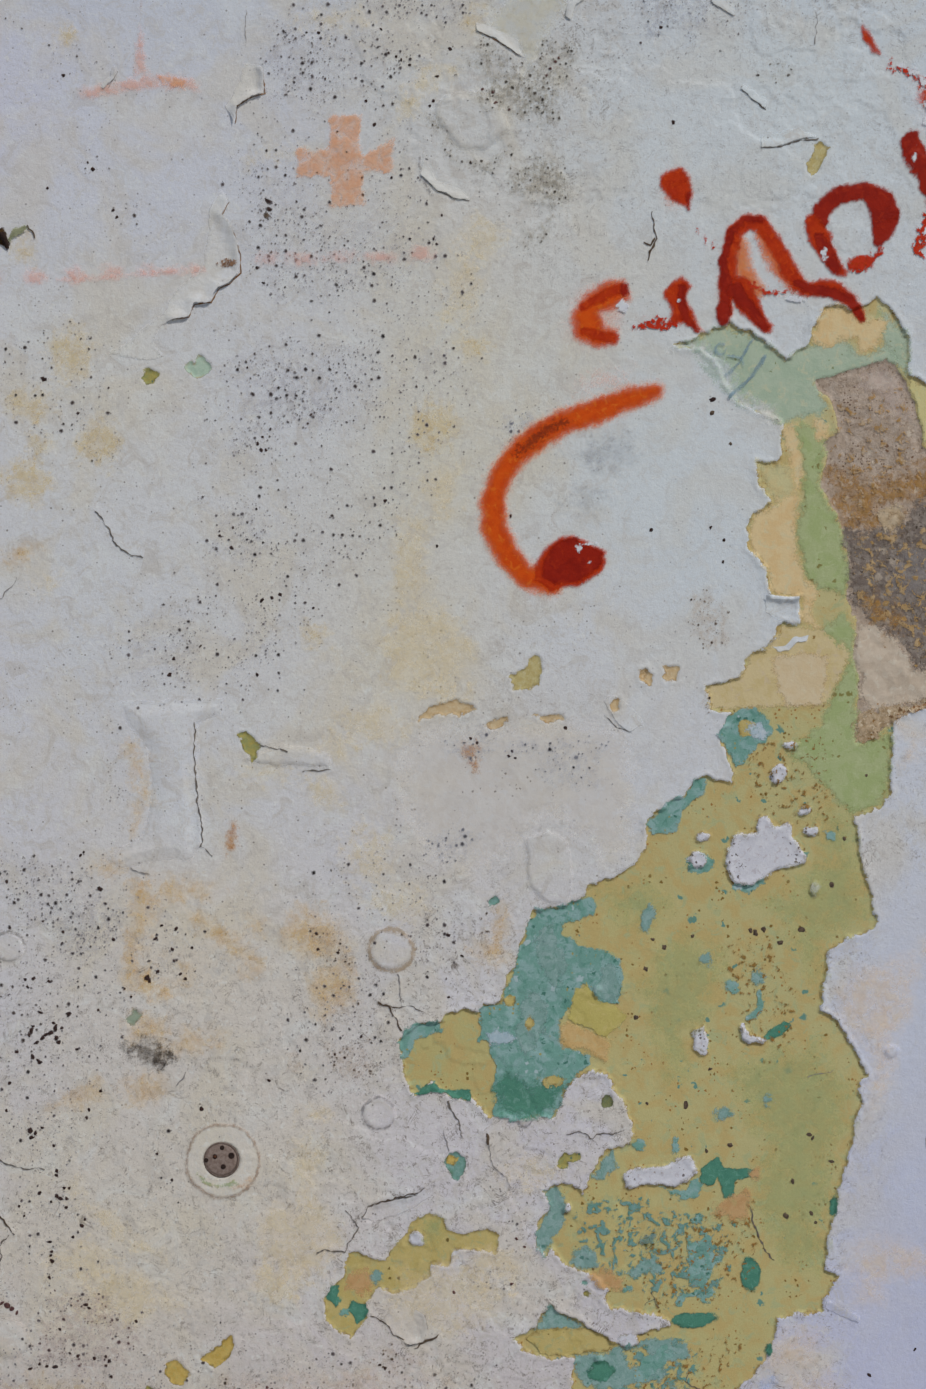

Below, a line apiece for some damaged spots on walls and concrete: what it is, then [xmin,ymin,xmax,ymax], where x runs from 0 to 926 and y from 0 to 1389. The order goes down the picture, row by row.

peeling [111,192,242,385]
leakage [105,0,578,713]
crack [95,511,143,558]
crack [193,723,212,856]
peeling [397,296,926,1389]
crack [316,1187,425,1254]
peeling [322,1188,499,1346]
peeling [165,1335,234,1386]